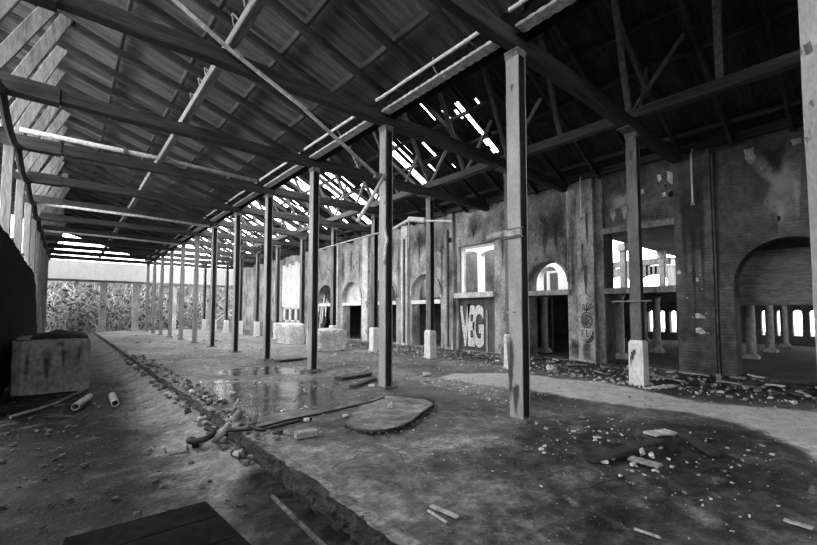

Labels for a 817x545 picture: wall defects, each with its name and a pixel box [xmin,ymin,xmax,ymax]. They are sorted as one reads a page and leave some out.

leakage [764,151,800,220]